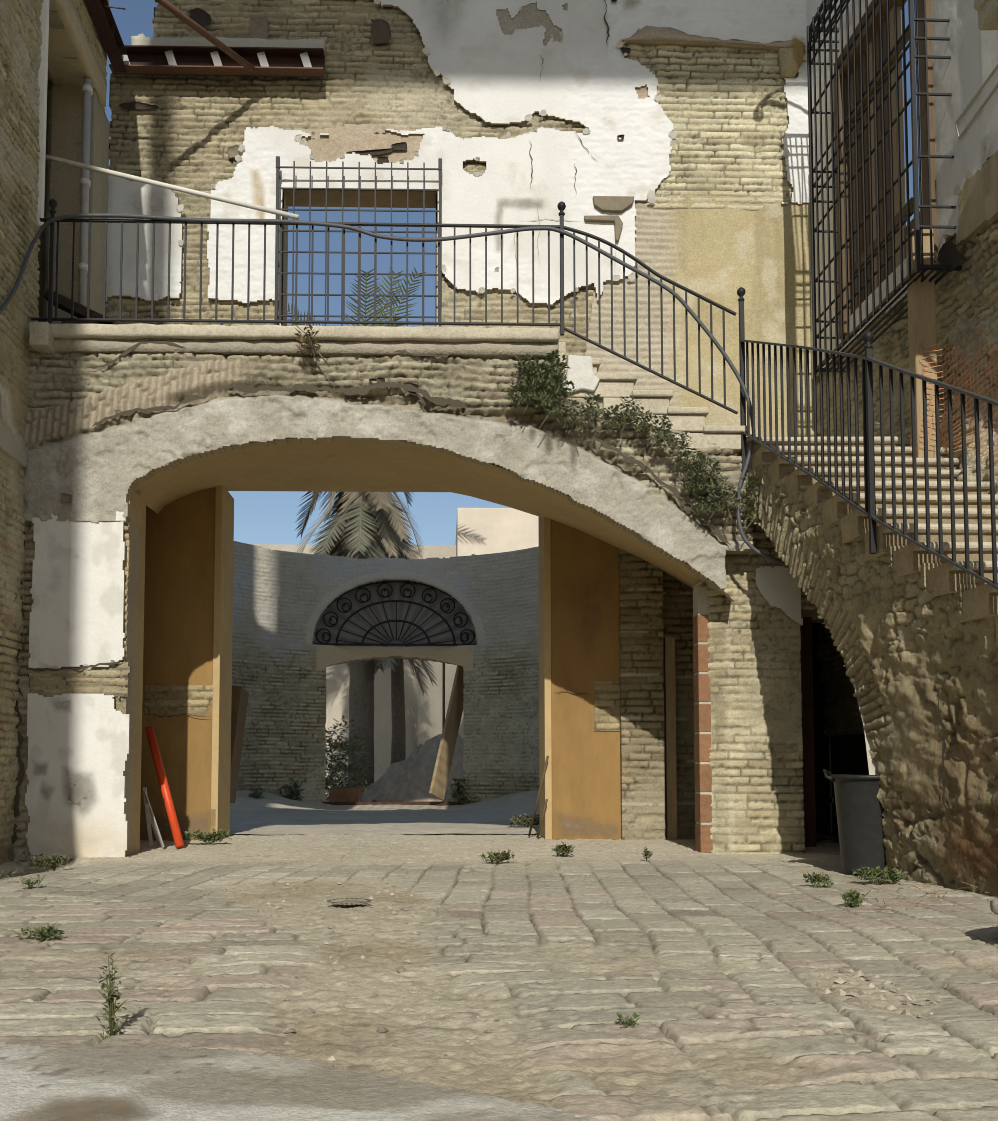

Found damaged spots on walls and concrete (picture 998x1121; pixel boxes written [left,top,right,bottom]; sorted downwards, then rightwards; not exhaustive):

peeling [106,0,591,326]
peeling [437,28,911,437]
peeling [934,150,998,509]
spalling [28,660,131,698]
leakage [67,774,93,810]
peeling [145,685,214,715]
peeling [817,623,865,736]
crack [921,699,966,867]